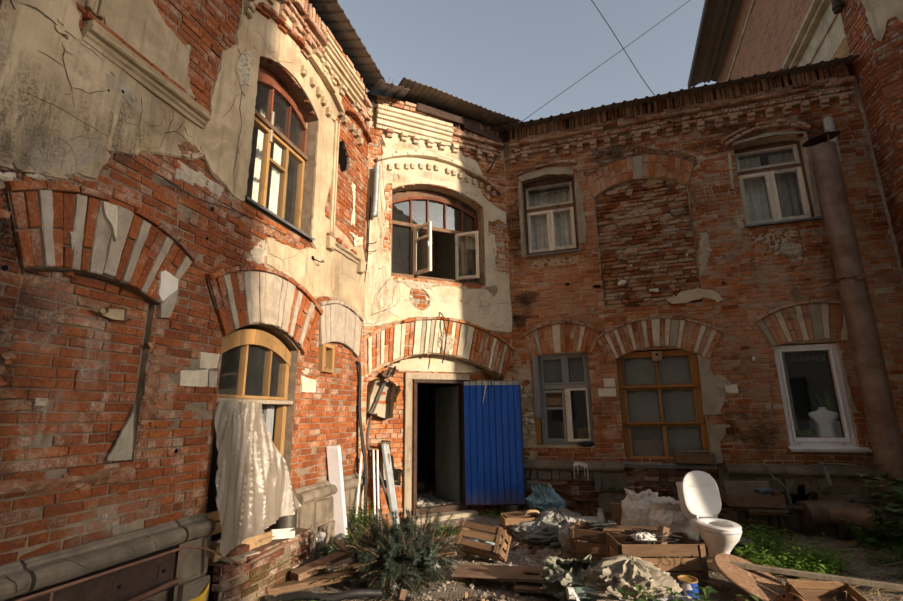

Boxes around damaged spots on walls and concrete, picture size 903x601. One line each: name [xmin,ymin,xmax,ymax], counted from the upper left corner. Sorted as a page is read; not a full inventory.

crack [19,3,108,170]
crack [123,98,186,147]
flaking render [178,128,205,160]
crack [224,29,294,187]
flaking render [391,276,443,315]